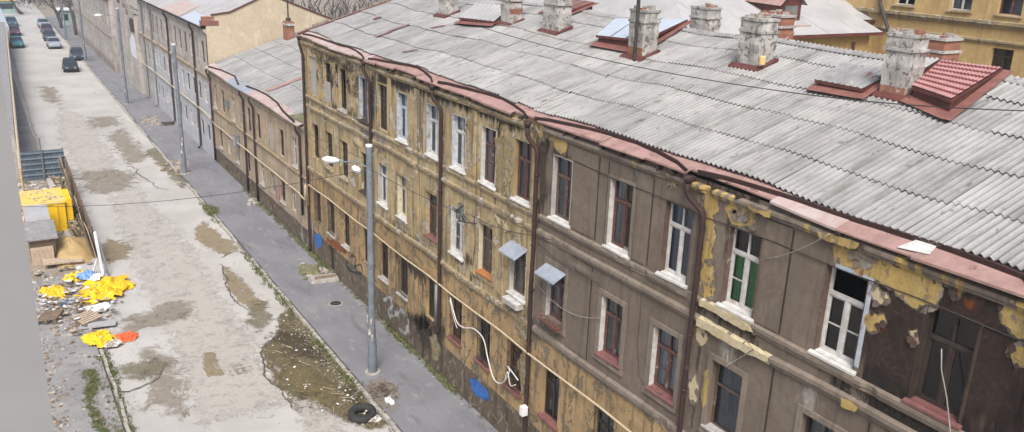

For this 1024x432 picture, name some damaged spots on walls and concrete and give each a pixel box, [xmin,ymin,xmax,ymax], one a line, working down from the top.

peeling [687,193,771,427]
peeling [817,231,967,334]
peeling [906,329,920,348]
peeling [997,294,1024,369]